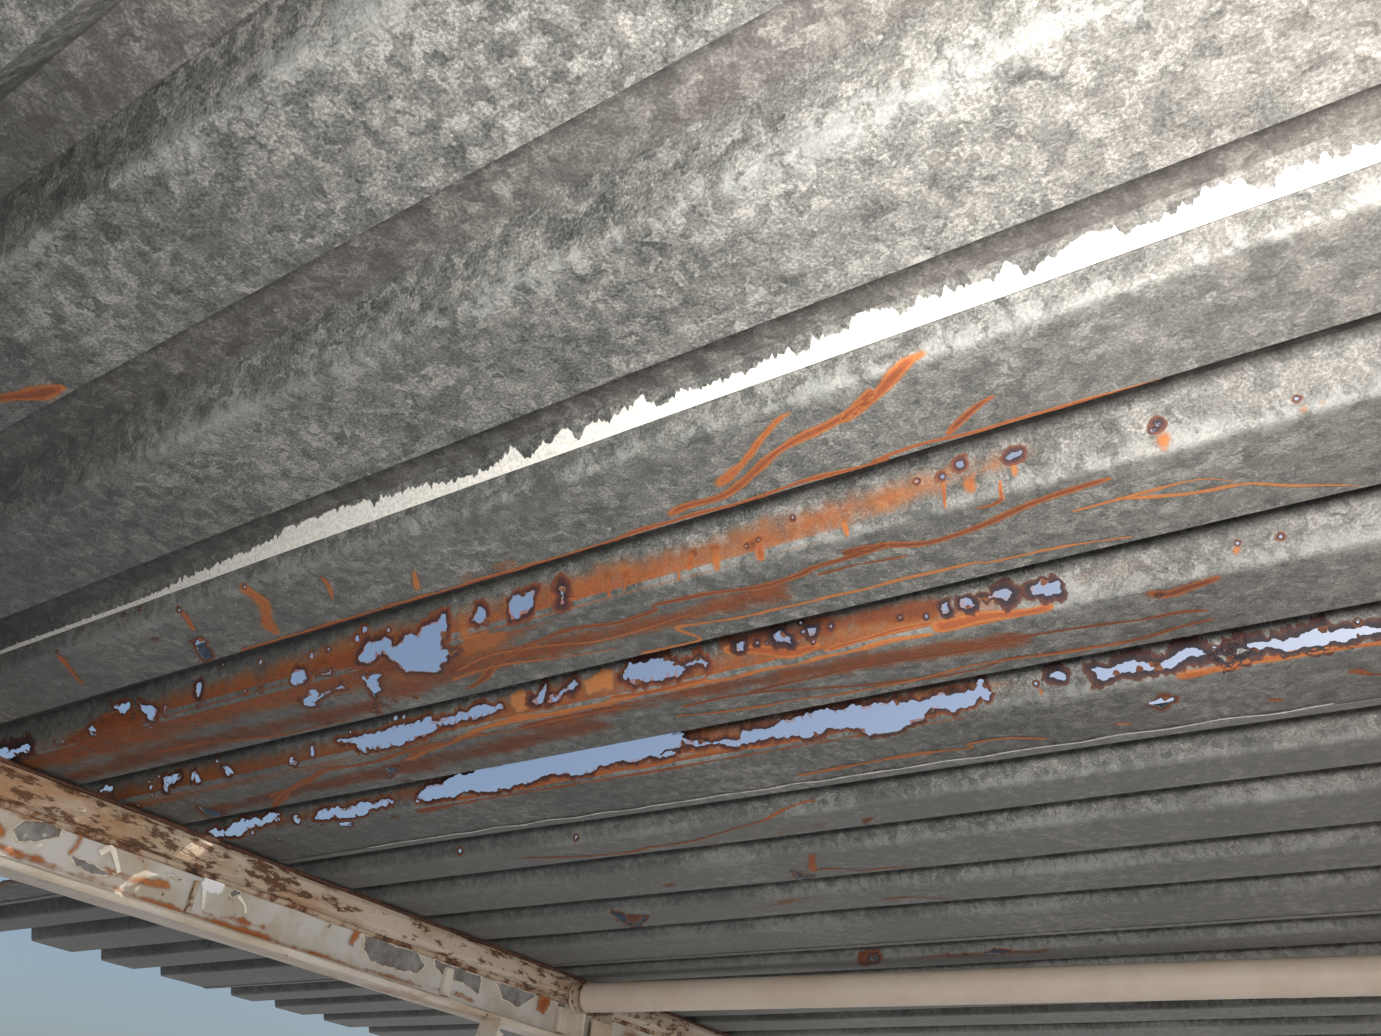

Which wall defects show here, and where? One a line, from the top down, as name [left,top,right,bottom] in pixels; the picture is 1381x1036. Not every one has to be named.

corrosion [0,384,67,402]
corrosion [1158,434,1169,447]
corrosion [240,351,1161,651]
peeling [1113,662,1163,676]
corrosion [0,465,1381,987]
peeling [9,819,64,844]
peeling [69,853,116,877]
peeling [361,933,536,1009]
corrosion [537,996,551,1014]
corrosion [660,1011,731,1036]